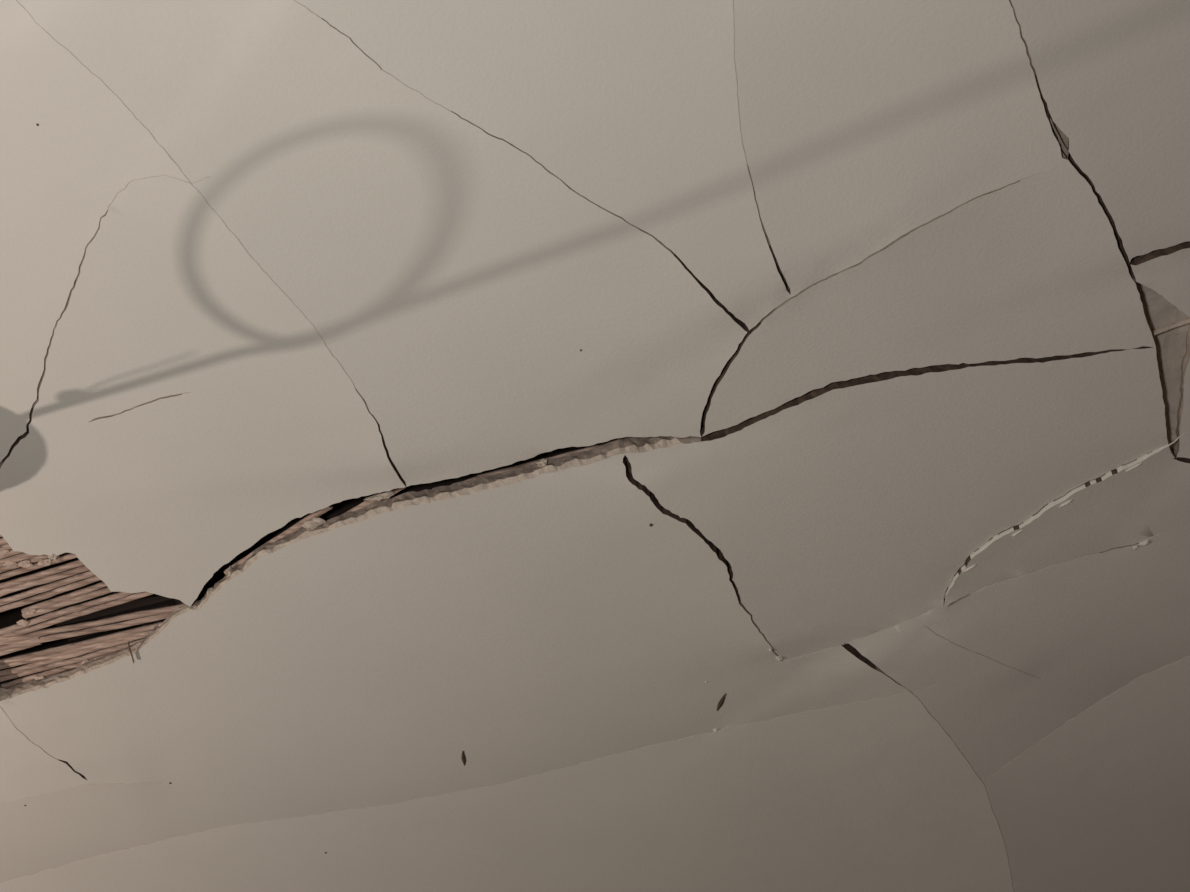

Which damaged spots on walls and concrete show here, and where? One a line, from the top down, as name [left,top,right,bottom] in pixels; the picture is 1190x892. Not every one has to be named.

crack [1009,0,1190,284]
crack [0,0,1129,661]
crack [0,707,87,780]
spalling [0,535,225,701]
crack [785,623,1015,892]
crack [944,432,1190,607]